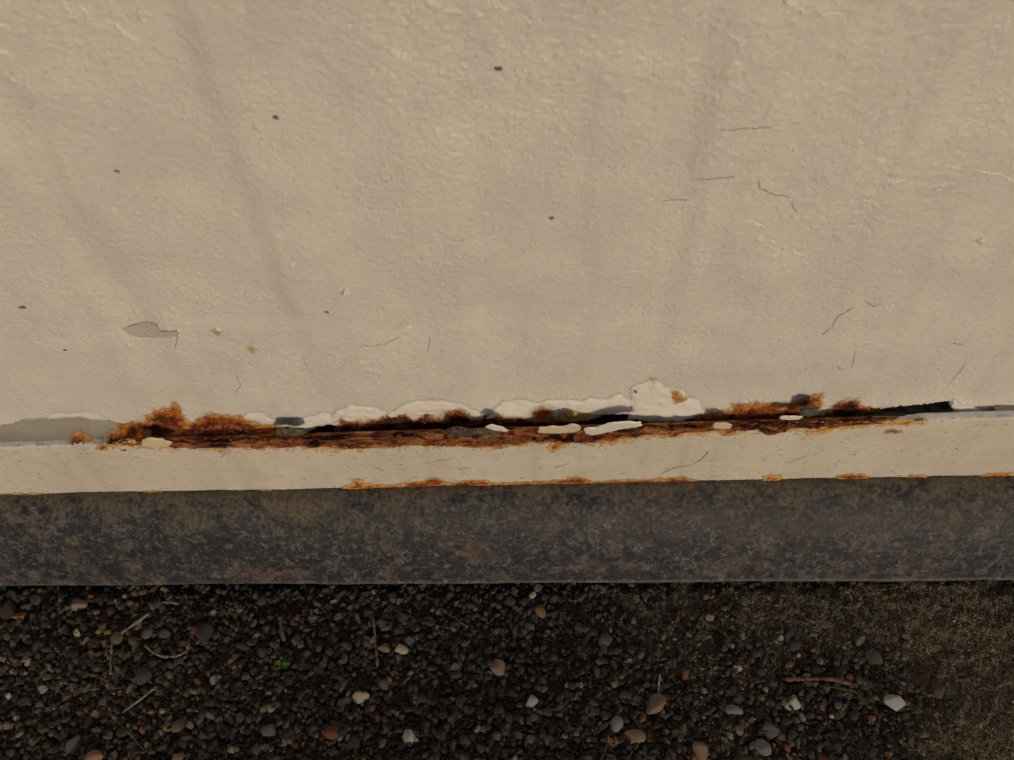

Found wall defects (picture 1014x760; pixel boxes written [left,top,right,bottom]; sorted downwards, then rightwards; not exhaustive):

peeling [121,321,179,339]
corrosion [672,391,687,403]
peeling [486,424,509,432]
corrosion [69,393,929,456]
peeling [537,421,643,435]
corrosion [341,476,697,489]